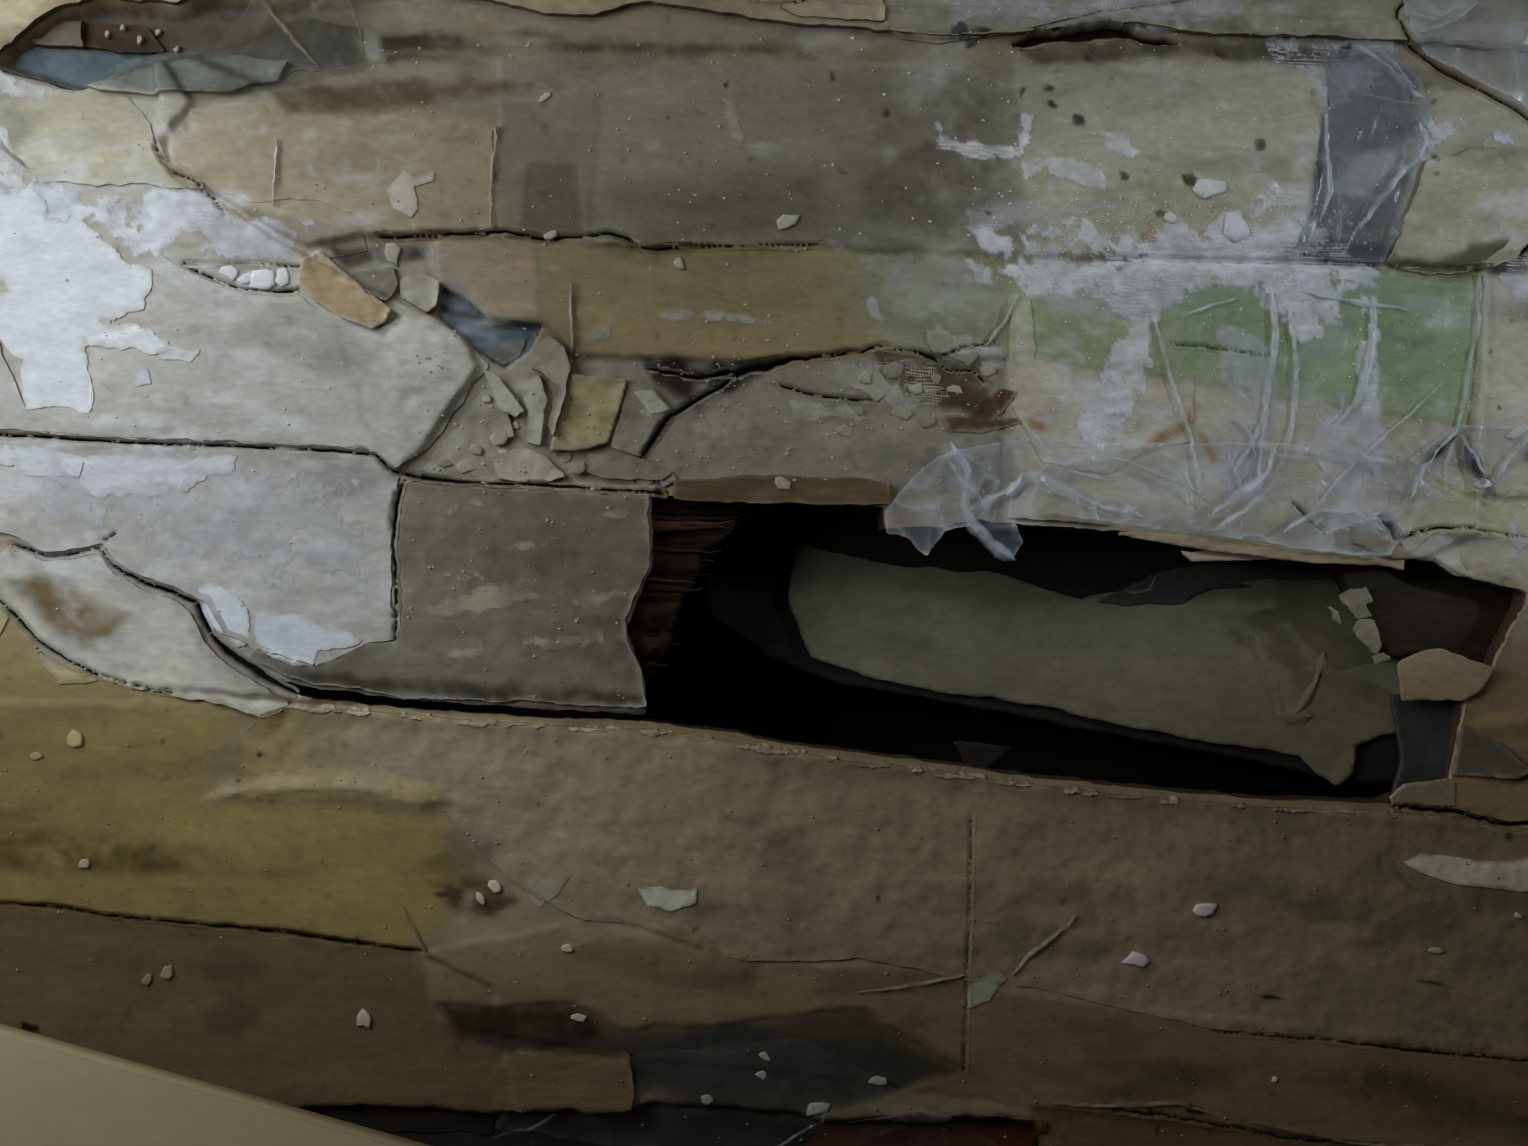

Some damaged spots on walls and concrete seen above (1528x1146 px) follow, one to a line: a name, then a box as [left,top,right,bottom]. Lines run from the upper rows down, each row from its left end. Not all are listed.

spalling [11,18,364,97]
crack [1013,17,1179,51]
leakage [951,0,1242,61]
leakage [1199,30,1400,105]
crack [1395,0,1528,124]
leakage [1415,100,1467,160]
peeling [0,181,200,414]
leakage [968,130,1528,501]
crack [0,338,1000,638]
spalling [198,562,1392,798]
peeling [1405,854,1528,892]
crack [0,899,426,956]